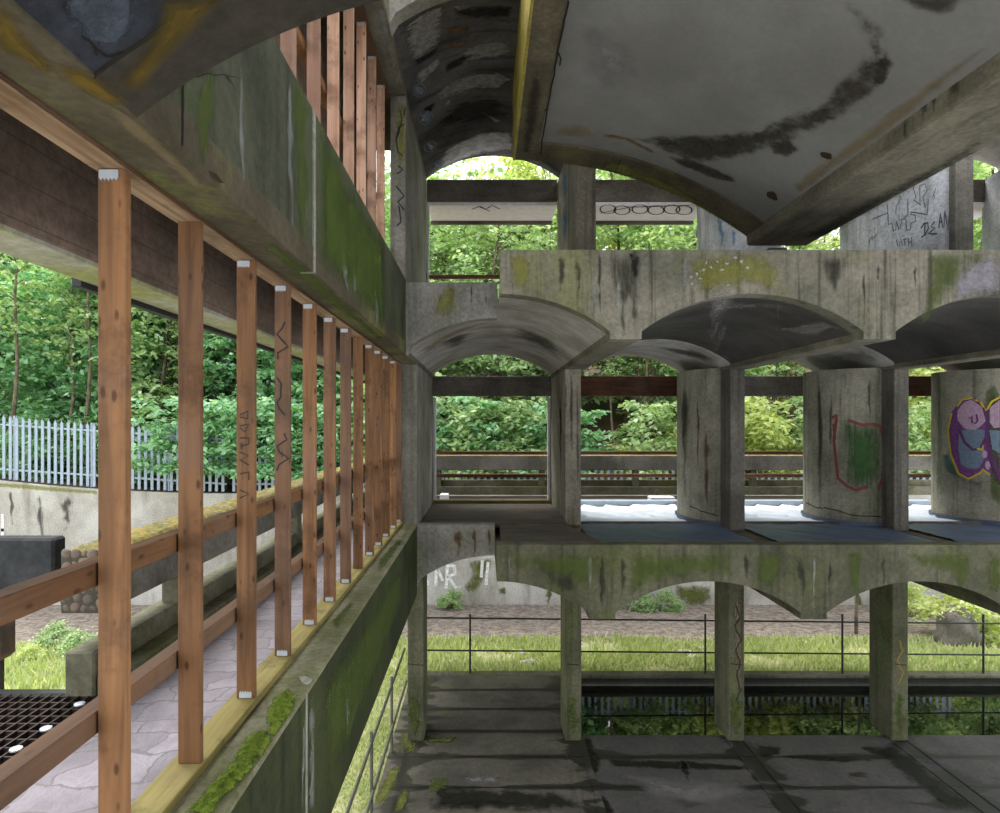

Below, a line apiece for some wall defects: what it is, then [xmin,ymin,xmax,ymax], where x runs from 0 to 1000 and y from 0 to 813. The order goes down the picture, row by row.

damp [911,0,953,11]
crack [182,73,246,146]
damp [652,46,891,181]
damp [614,254,638,325]